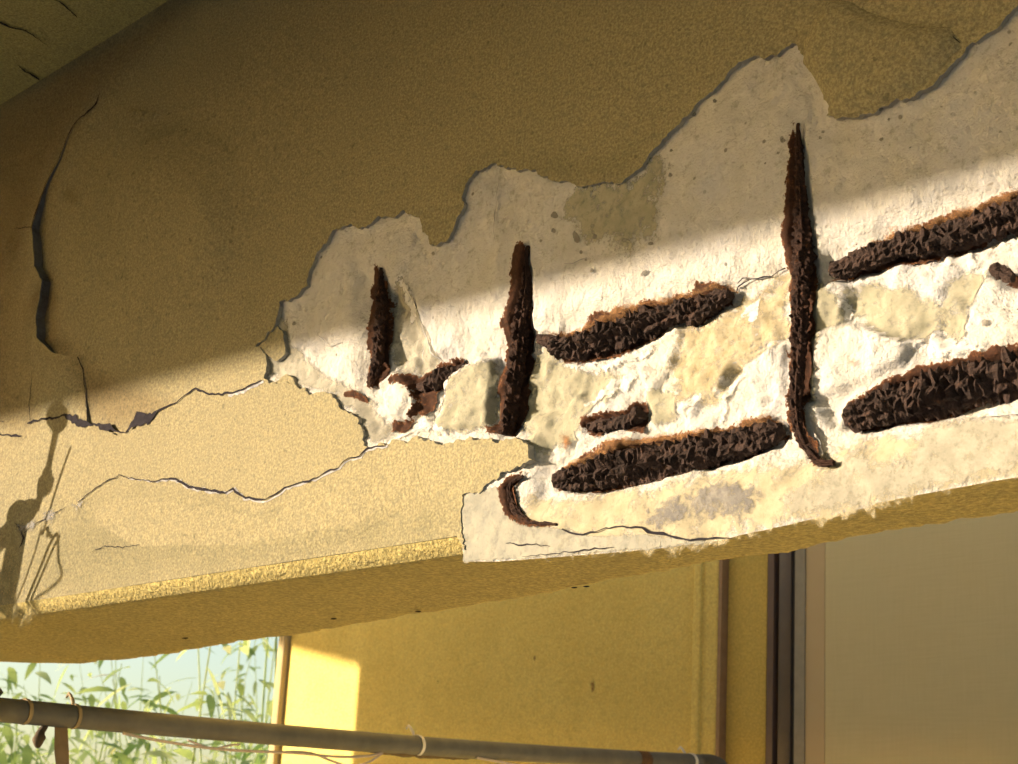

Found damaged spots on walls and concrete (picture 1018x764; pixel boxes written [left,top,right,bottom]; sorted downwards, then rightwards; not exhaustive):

crack [0,22,48,46]
crack [13,93,100,230]
crack [0,356,263,437]
rust [343,264,464,433]
rust [485,241,526,434]
spalling [258,11,1018,531]
rust [549,242,998,491]
rust [780,123,796,336]
rust [846,342,1018,405]
rust [854,187,1018,250]
crack [0,445,388,547]
spalling [474,509,820,562]